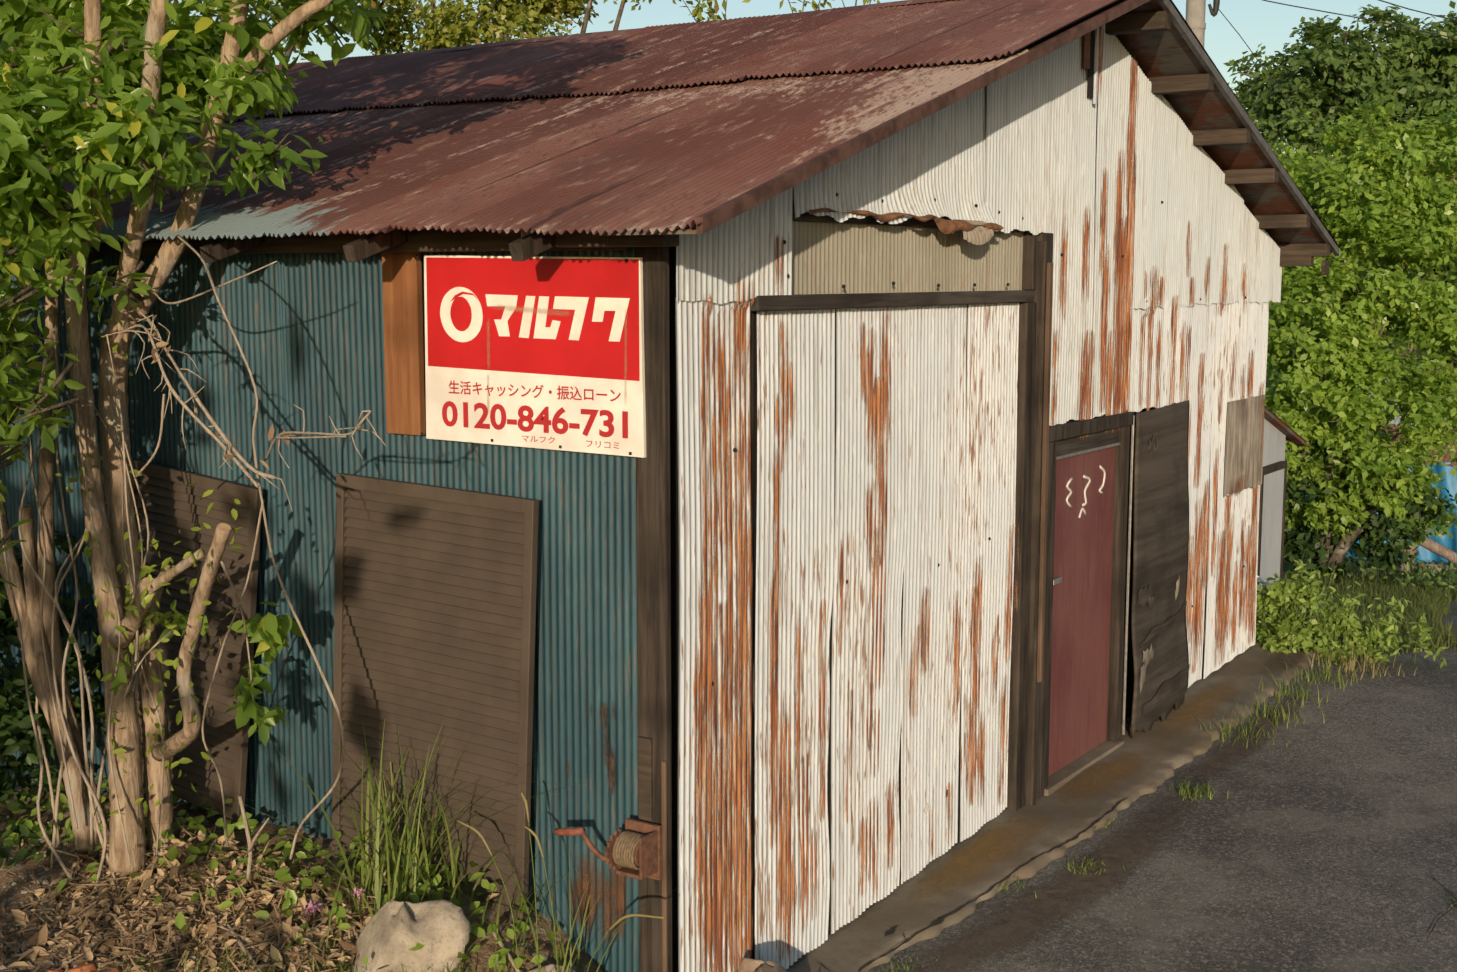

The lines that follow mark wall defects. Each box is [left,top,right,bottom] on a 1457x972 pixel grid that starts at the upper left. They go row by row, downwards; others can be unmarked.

rust [1081,27,1104,91]
rust [694,280,754,972]
rust [769,322,846,954]
rust [846,309,894,899]
rust [908,588,931,717]
rust [929,529,1018,857]
rust [1051,56,1265,671]